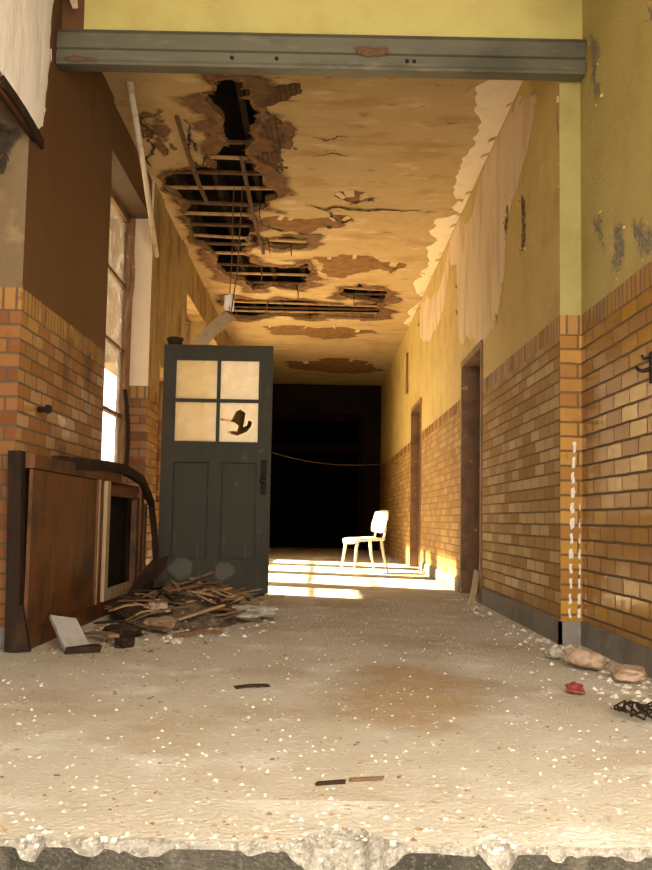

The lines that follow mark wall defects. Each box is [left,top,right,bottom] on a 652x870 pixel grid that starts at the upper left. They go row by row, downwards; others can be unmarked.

flaking render [0,0,54,129]
leakage [0,124,20,174]
peeling [261,215,355,236]
peeling [334,190,378,205]
flaking render [403,80,536,344]
peeling [313,254,407,280]
spalling [15,834,46,862]
spalling [69,836,174,857]
spalling [284,827,408,870]
spalling [479,841,519,870]